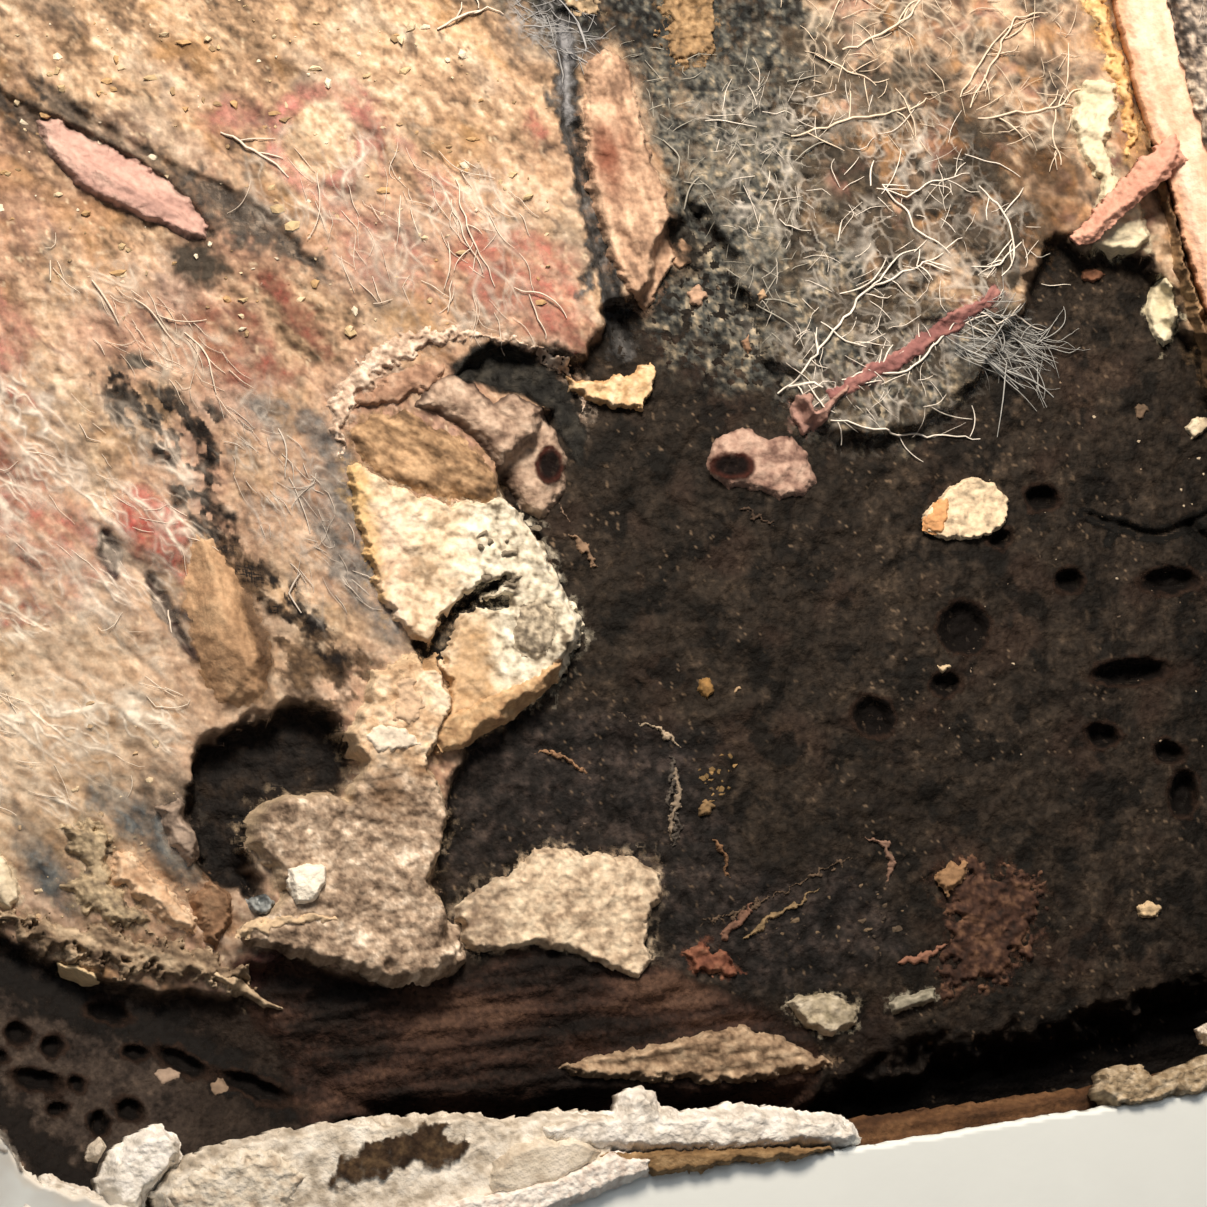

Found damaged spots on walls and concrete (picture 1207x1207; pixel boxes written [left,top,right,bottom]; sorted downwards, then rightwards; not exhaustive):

damp [266,86,400,195]
damp [456,232,576,330]
damp [527,0,1075,451]
peeling [1071,0,1153,205]
spalling [213,49,1207,1125]
peeling [0,856,253,989]
spalling [56,706,349,951]
spalling [0,929,313,1200]
spalling [145,1107,650,1207]
spalling [543,1085,862,1177]